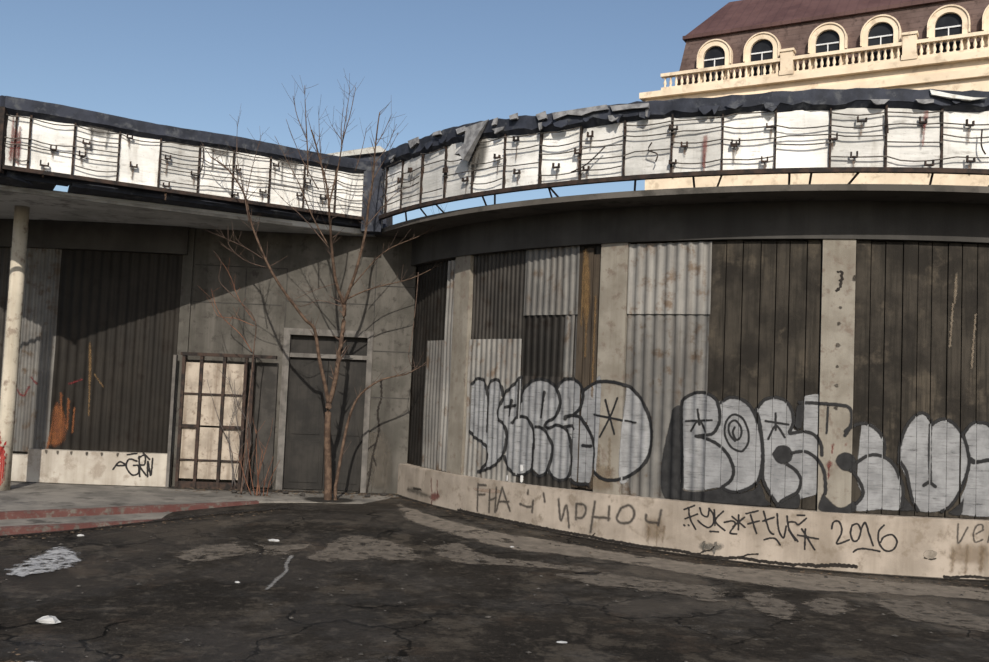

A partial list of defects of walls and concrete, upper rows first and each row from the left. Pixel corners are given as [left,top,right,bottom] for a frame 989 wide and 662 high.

rust [9,117,21,165]
peeling [454,113,518,161]
peeling [536,103,651,131]